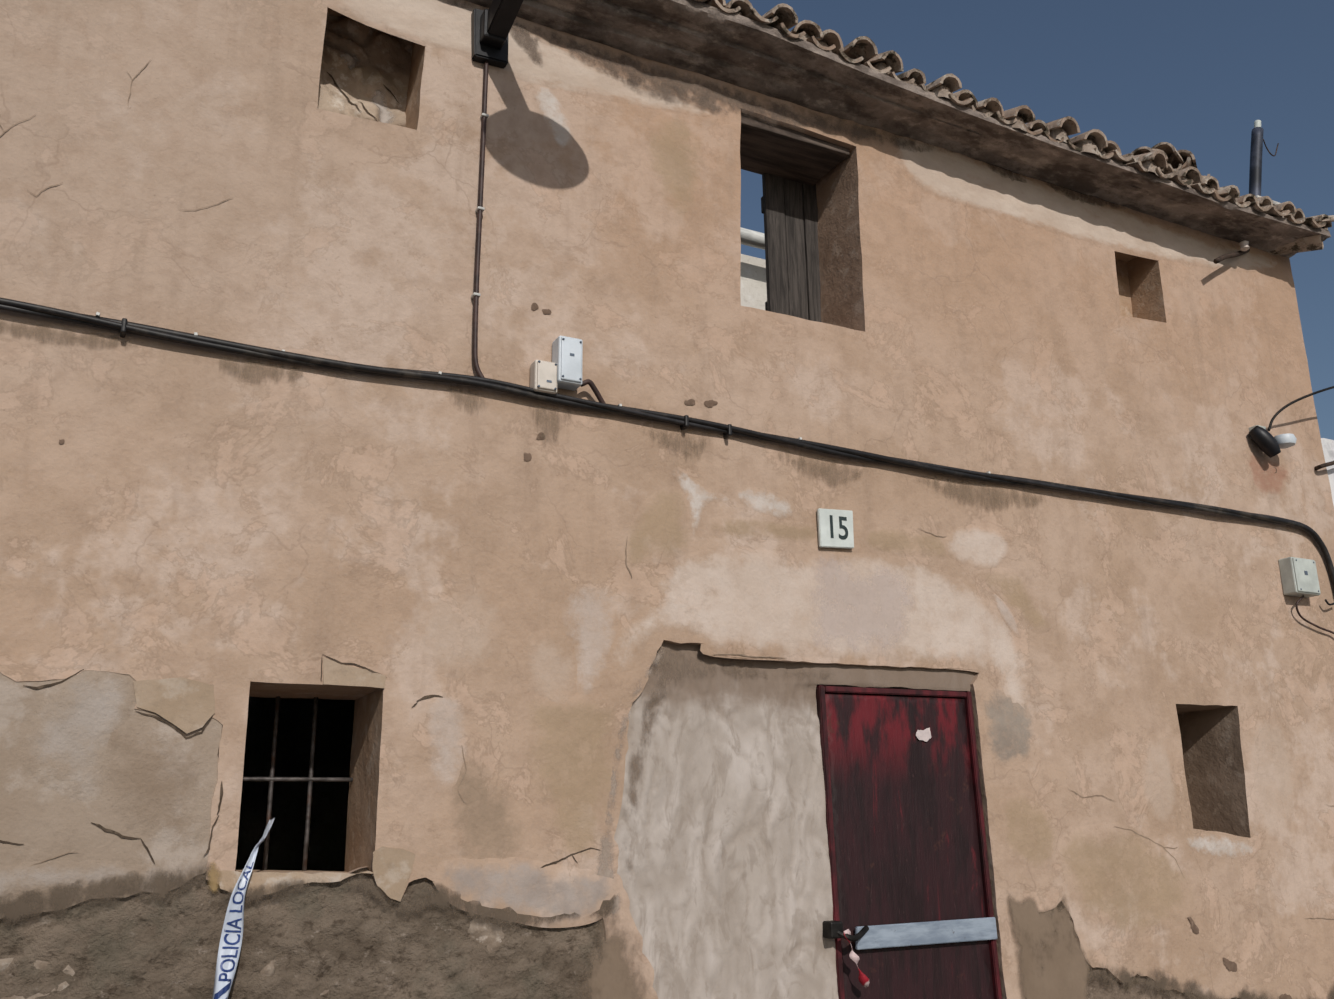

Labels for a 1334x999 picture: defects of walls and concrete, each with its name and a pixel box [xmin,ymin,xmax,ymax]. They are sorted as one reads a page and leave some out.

spalling [0,672,604,999]